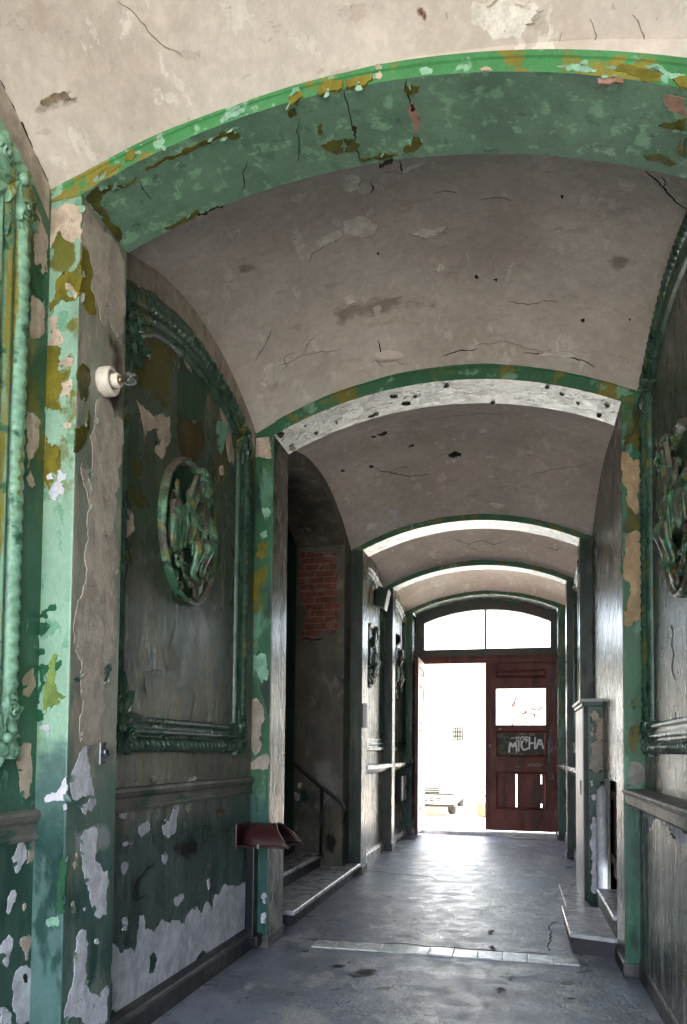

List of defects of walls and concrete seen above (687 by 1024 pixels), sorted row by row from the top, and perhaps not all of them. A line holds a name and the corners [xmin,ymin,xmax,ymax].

crack [118,2,183,57]
peeling [471,0,546,40]
peeling [317,64,383,98]
peeling [557,59,687,167]
crack [645,171,686,209]
spalling [21,105,246,815]
peeling [619,413,642,630]
spalling [6,889,26,914]
spalling [0,935,32,1024]
spalling [46,827,109,932]
spalling [63,878,245,1024]
crack [380,922,557,954]